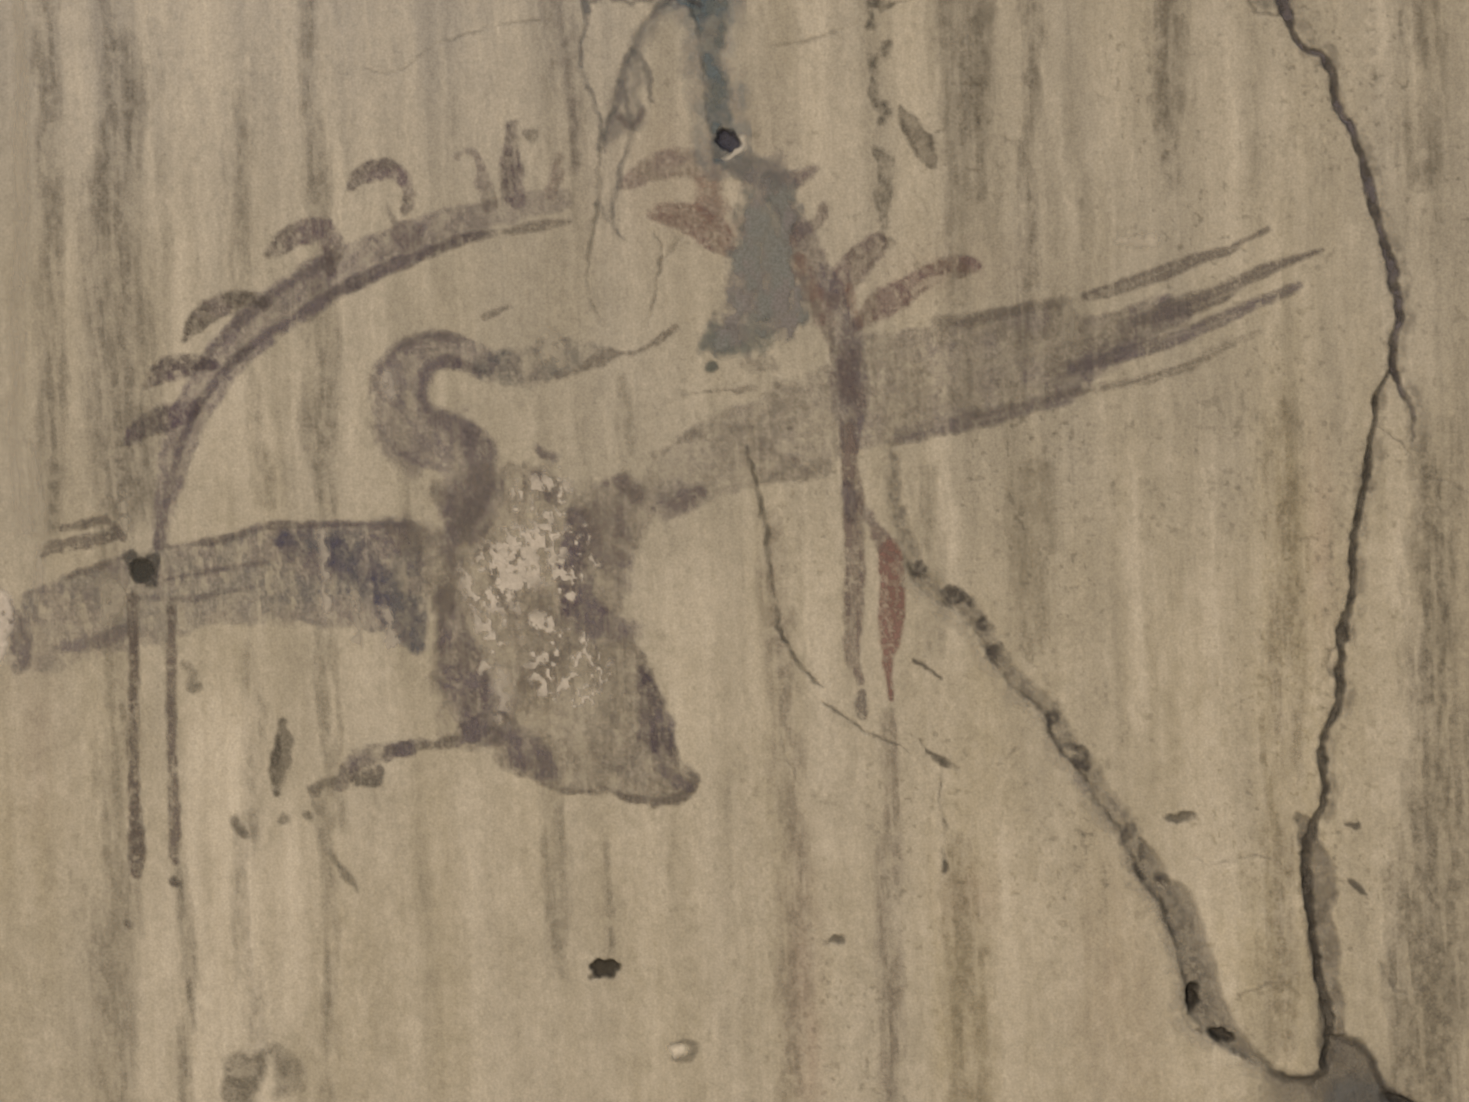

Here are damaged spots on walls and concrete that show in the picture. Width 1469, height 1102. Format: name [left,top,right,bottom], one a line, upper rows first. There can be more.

crack [581,0,589,13]
crack [607,51,641,132]
crack [652,0,731,162]
crack [752,465,770,544]
crack [1276,0,1412,1069]
spalling [0,590,13,660]
peeling [461,475,611,721]
crack [776,619,813,679]
crack [891,455,1261,1063]
spalling [1274,1036,1410,1102]